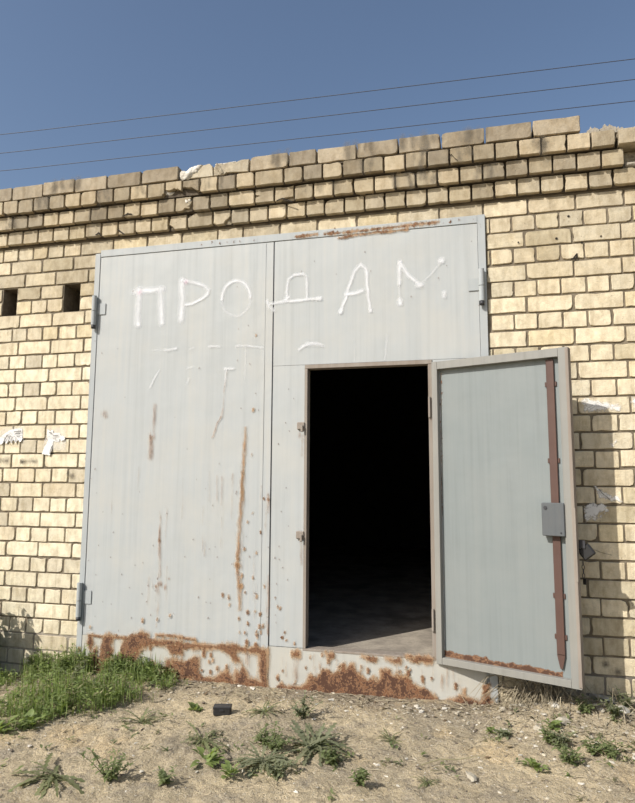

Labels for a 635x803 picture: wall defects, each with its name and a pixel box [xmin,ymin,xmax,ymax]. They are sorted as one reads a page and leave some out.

rust [295,221,437,239]
rust [78,427,495,705]
rust [445,650,563,677]